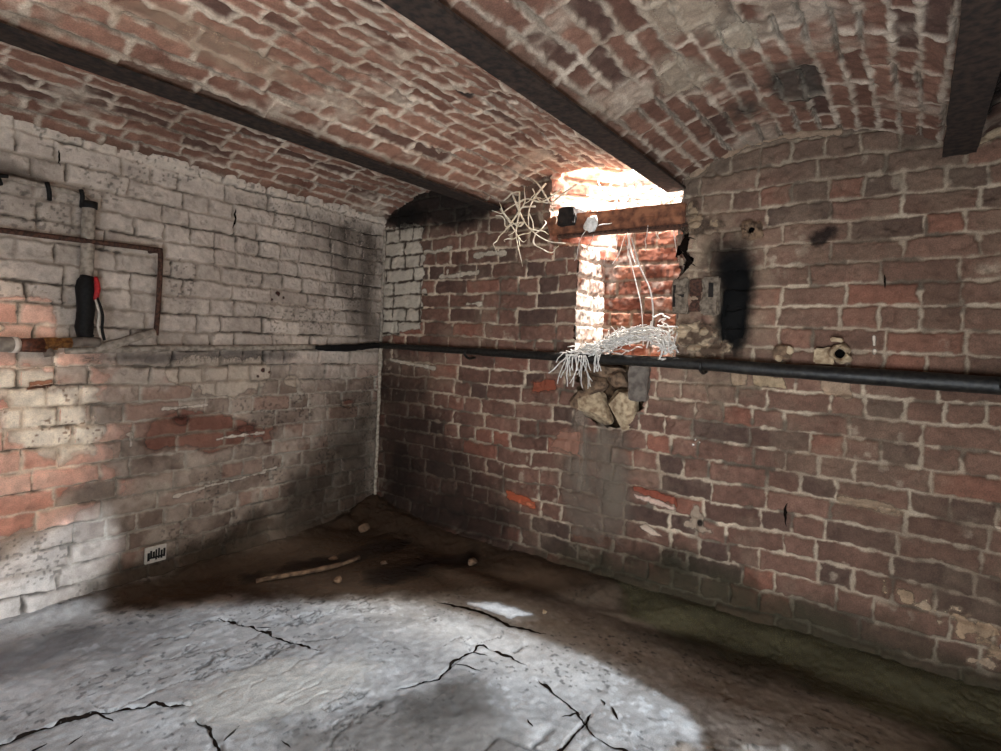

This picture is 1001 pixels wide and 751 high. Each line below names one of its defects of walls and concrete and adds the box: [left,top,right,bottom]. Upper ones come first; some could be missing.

peeling [0,297,56,338]
water stain [711,242,750,356]
peeling [165,355,271,398]
peeling [0,346,132,539]
peeling [144,408,274,454]
crack [441,603,545,634]
flaking render [883,579,1001,670]
crack [401,644,628,751]
crack [0,701,221,751]